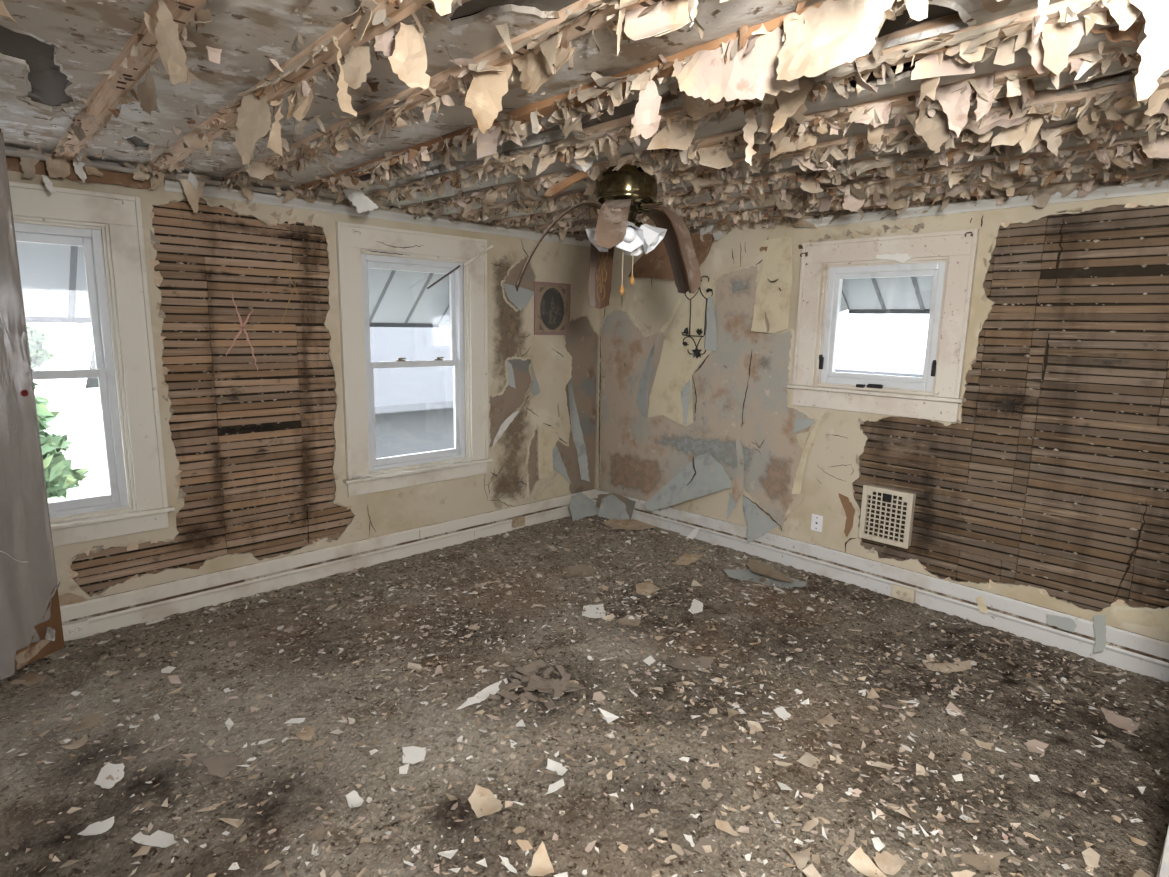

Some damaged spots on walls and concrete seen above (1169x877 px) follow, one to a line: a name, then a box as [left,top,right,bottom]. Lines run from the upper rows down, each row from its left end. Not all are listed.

flaking render [0,0,1169,612]